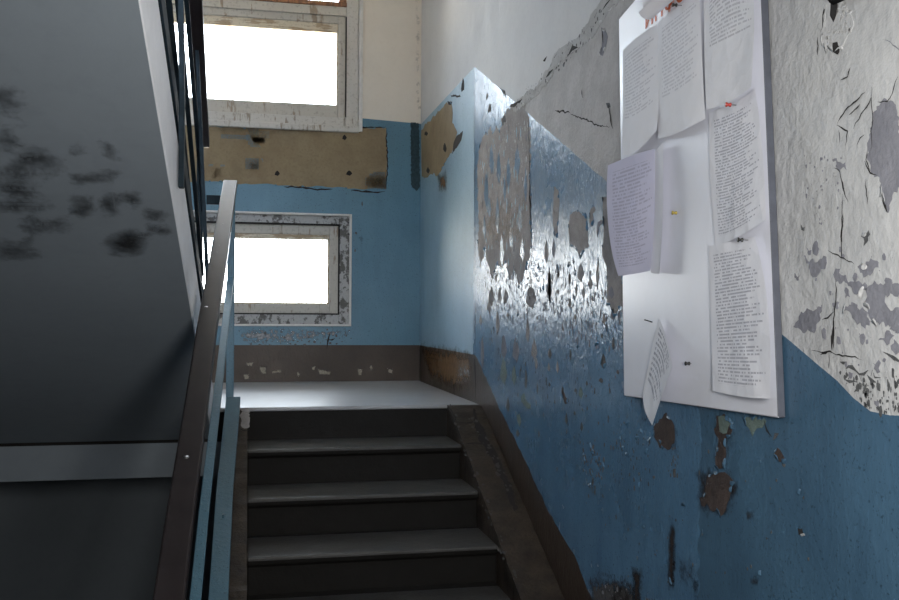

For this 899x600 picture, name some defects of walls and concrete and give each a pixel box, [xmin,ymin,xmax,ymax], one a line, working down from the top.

spalling [817,0,854,55]
peeling [421,80,464,188]
crack [557,89,613,128]
spalling [803,155,847,225]
peeling [865,77,899,213]
peeling [477,0,678,526]
crack [811,200,858,366]
peeling [793,241,899,418]
peeling [699,414,786,517]
peeling [590,557,641,600]